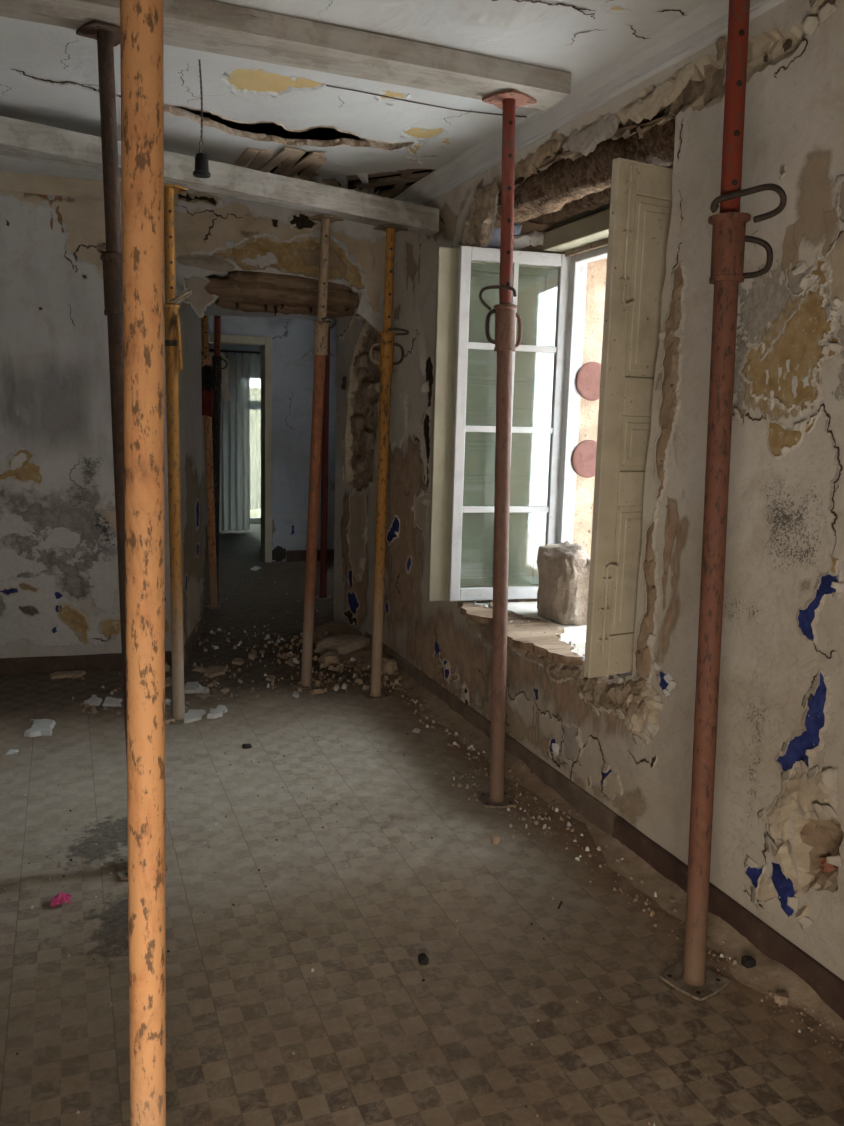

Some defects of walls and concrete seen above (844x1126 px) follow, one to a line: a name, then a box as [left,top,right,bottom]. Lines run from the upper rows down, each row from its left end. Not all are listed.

peeling [222,68,327,98]
crack [492,0,687,45]
flaking render [580,38,727,144]
flaking render [746,0,837,83]
peeling [0,191,106,280]
flaking render [458,129,583,250]
peeling [734,175,844,460]
peeling [164,191,434,640]
leakage [0,455,117,598]
peeling [795,555,844,646]
crack [478,669,654,802]
flaking render [744,666,844,930]